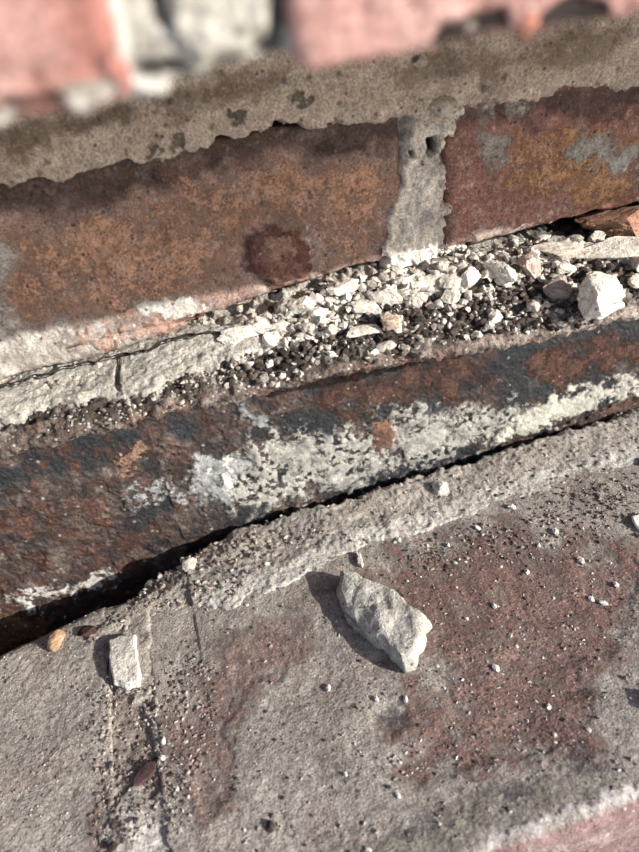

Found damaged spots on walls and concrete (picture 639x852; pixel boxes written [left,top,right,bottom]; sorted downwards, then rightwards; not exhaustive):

crack [0,280,308,390]
rust [526,331,639,394]
rust [310,356,496,452]
rust [563,393,639,430]
rust [113,440,149,478]
peeling [221,374,639,522]
rust [502,432,535,449]
rust [0,611,56,655]
rust [77,625,97,637]